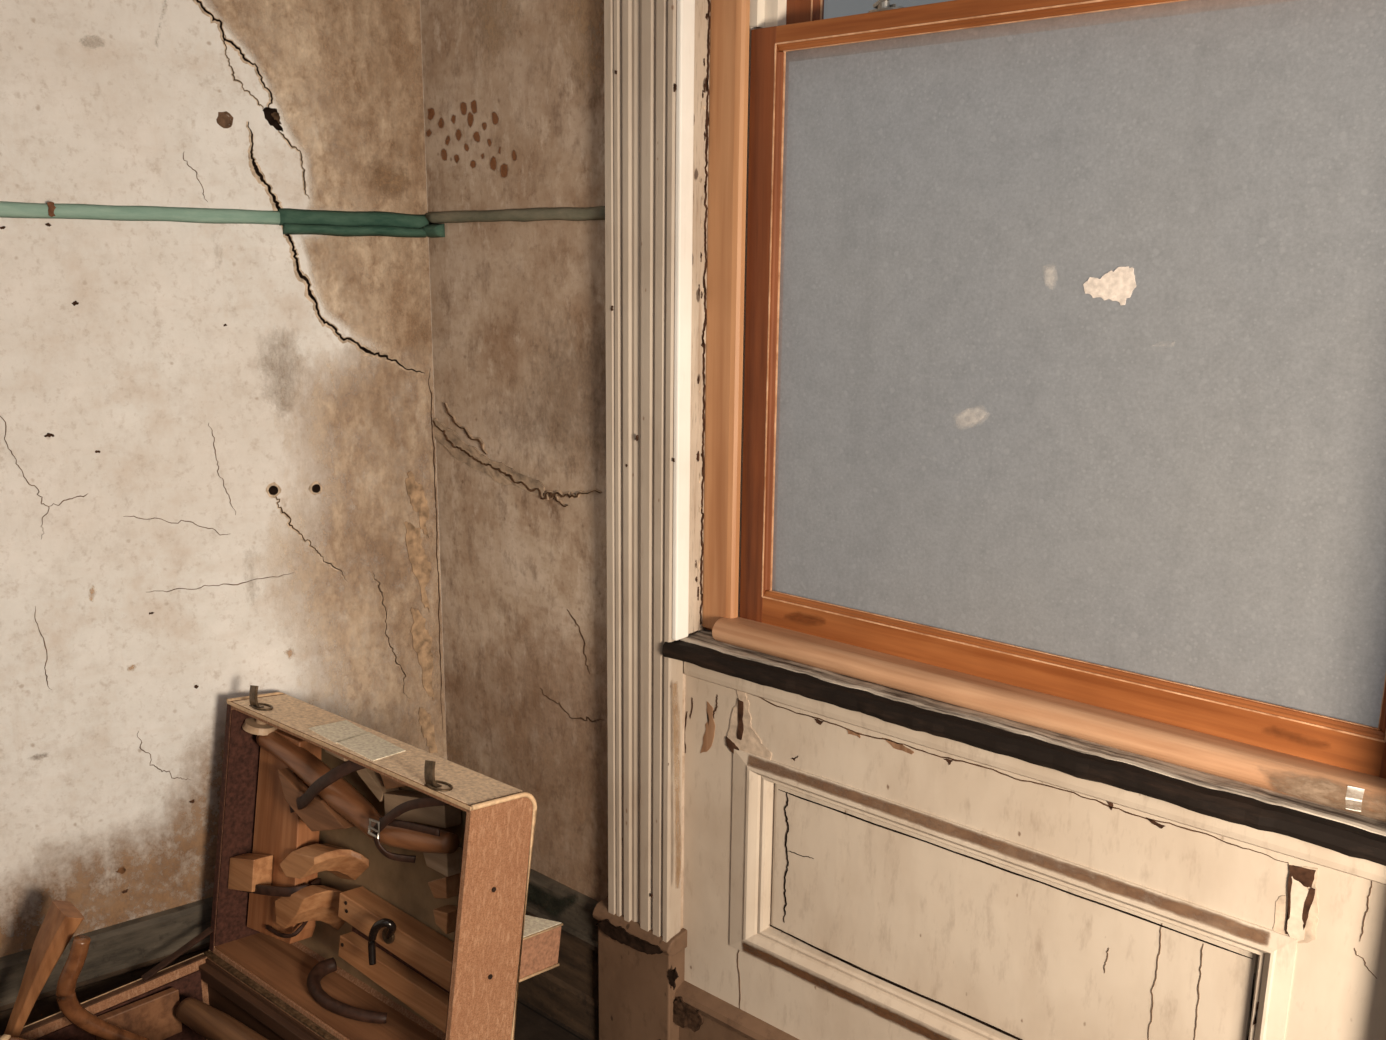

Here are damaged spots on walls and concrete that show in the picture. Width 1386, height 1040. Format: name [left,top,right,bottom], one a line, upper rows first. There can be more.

rust [426,100,517,178]
crack [151,0,602,729]
crack [0,416,87,539]
crack [123,423,236,535]
crack [34,606,50,689]
crack [137,731,190,780]
damp [0,738,224,957]
peeling [700,690,1319,945]
crack [770,789,1255,1040]
crack [735,950,743,1009]